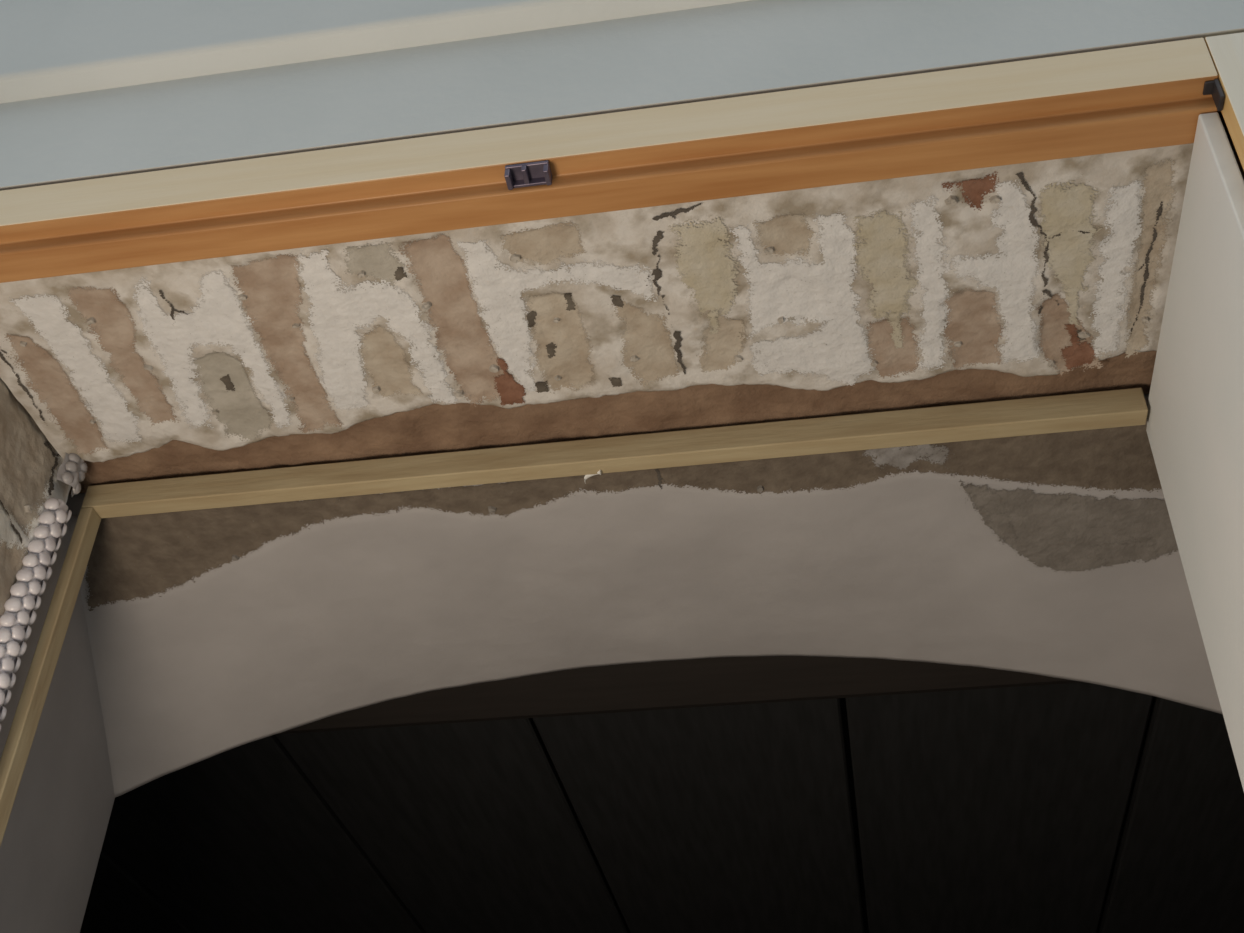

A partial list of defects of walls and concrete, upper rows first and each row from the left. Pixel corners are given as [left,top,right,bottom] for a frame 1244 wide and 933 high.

crack [0,500,22,543]
crack [0,350,61,495]
flaking render [0,334,108,617]
flaking render [65,286,179,425]
flaking render [227,253,342,433]
flaking render [343,233,515,407]
flaking render [525,291,679,394]
flaking render [84,420,1162,611]
crack [646,203,703,374]
flaking render [942,172,1001,211]
crack [1016,172,1090,314]
flaking render [1123,159,1176,358]